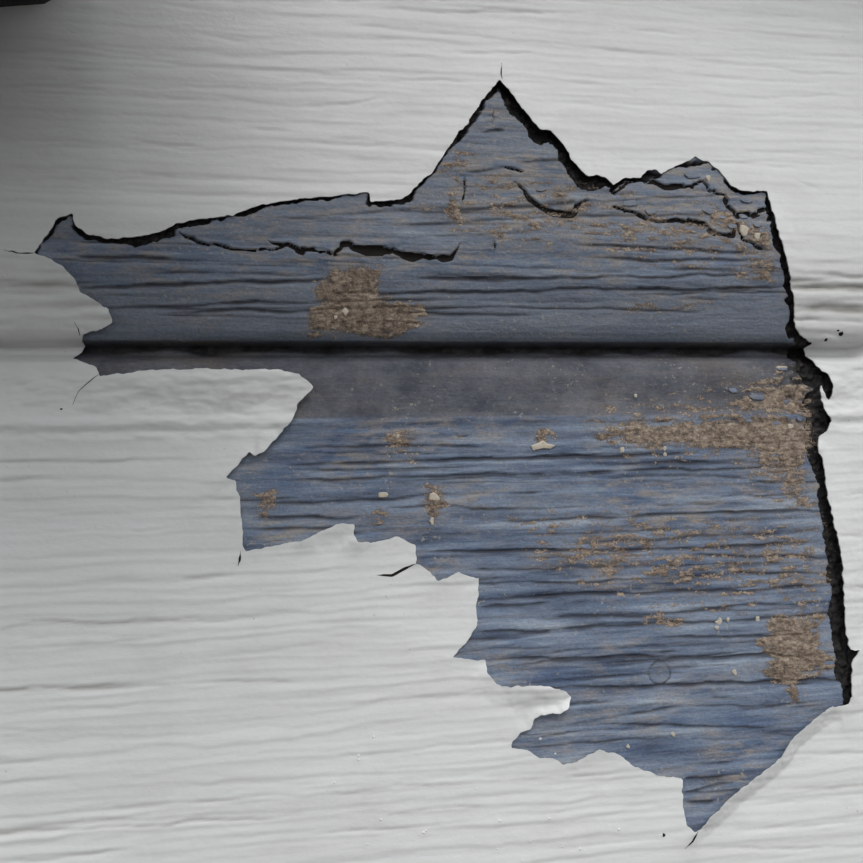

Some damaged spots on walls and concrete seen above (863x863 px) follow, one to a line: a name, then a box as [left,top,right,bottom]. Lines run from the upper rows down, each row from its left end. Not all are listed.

peeling [684,170,701,178]
peeling [740,231,763,247]
peeling [531,440,555,451]